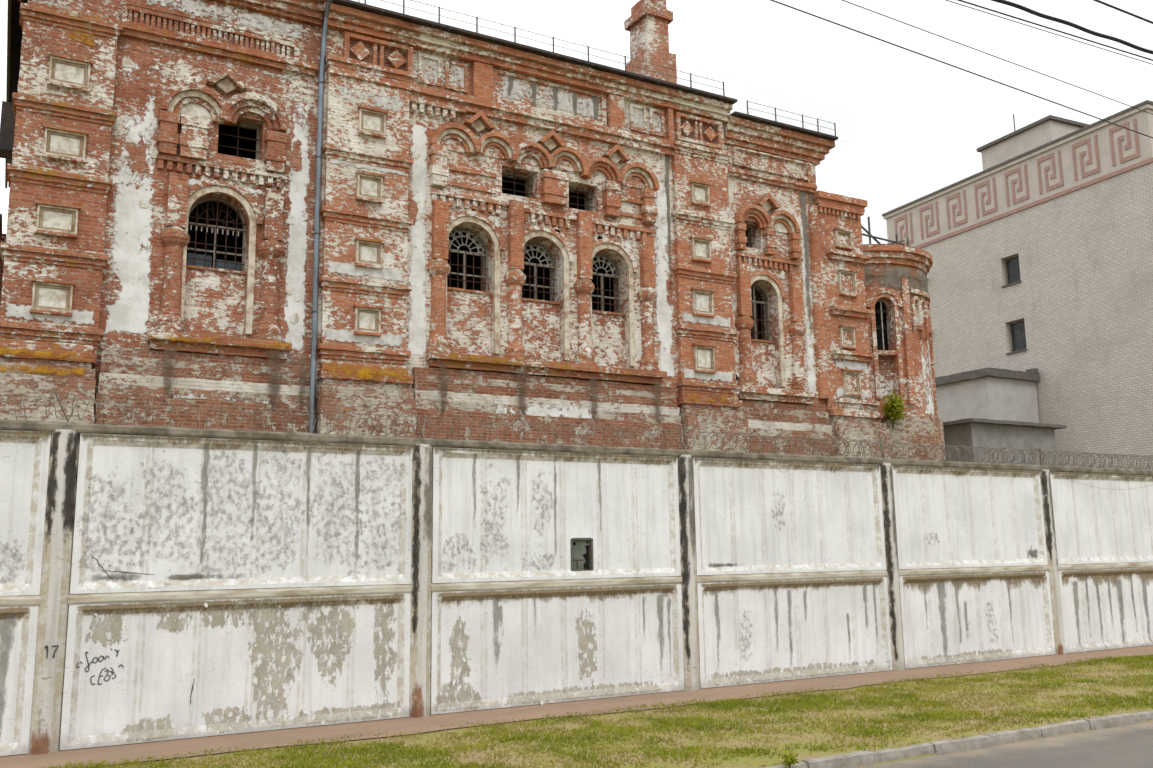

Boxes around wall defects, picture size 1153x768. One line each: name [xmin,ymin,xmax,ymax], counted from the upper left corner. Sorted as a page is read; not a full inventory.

peeling [143,0,310,42]
peeling [500,79,594,117]
spalling [110,142,158,208]
peeling [5,262,123,325]
damp [266,350,284,409]
damp [62,433,411,561]
damp [424,447,1153,565]
damp [924,582,968,653]
damp [1073,575,1151,647]
damp [0,613,16,726]
peeling [155,596,401,733]
peeling [435,616,482,712]